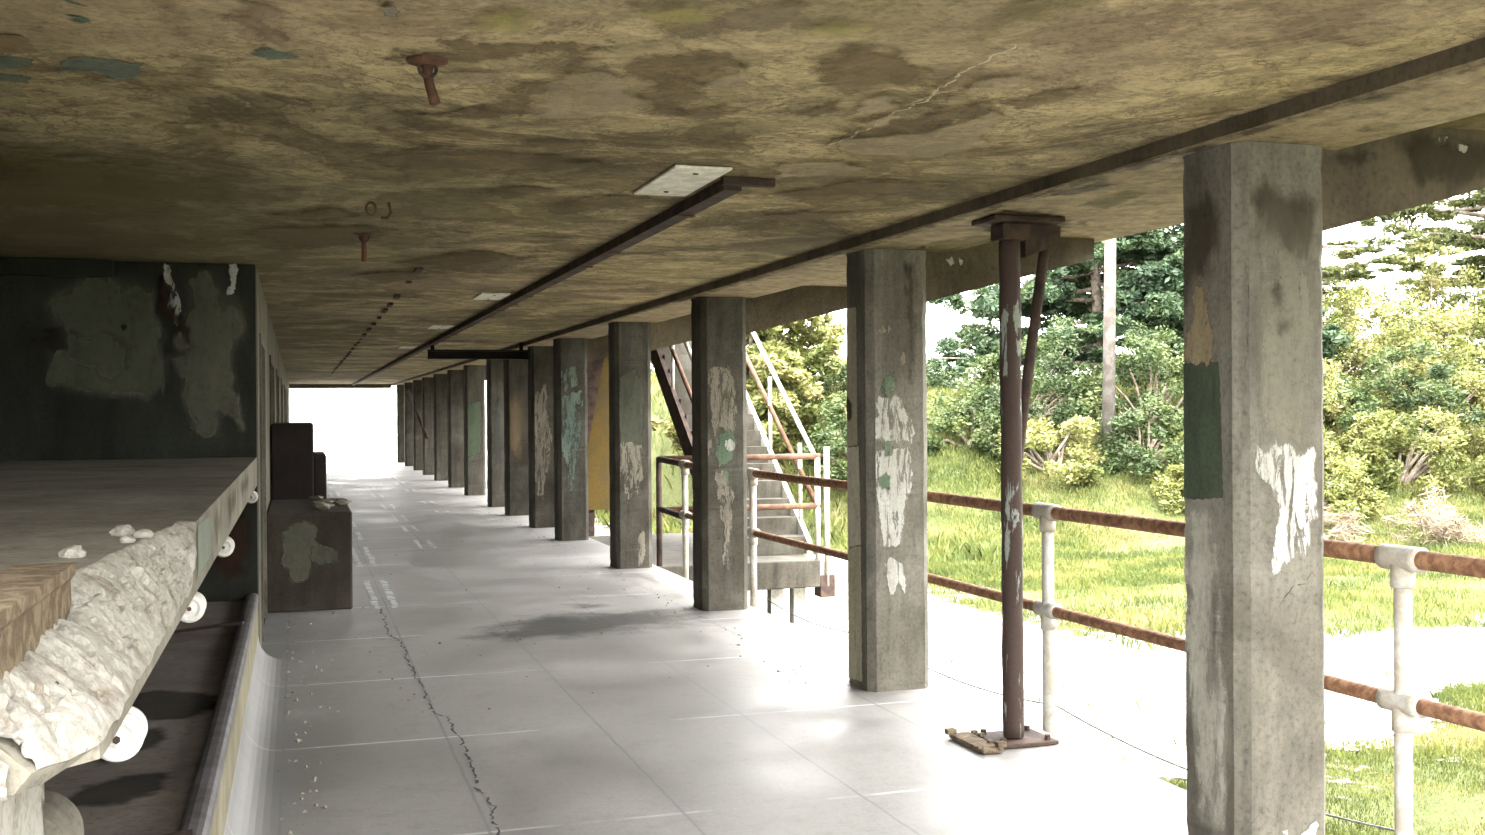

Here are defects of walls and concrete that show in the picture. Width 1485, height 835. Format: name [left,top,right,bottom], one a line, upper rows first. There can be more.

water stain [385,12,613,120]
water stain [367,139,671,214]
water stain [625,0,932,120]
crack [832,44,1016,144]
water stain [890,89,1082,134]
water stain [1183,195,1217,306]
peeling [41,266,247,439]
peeling [707,364,738,567]
peeling [875,351,915,596]
peeling [1255,218,1321,575]
spalling [0,515,211,769]
crack [365,608,500,835]